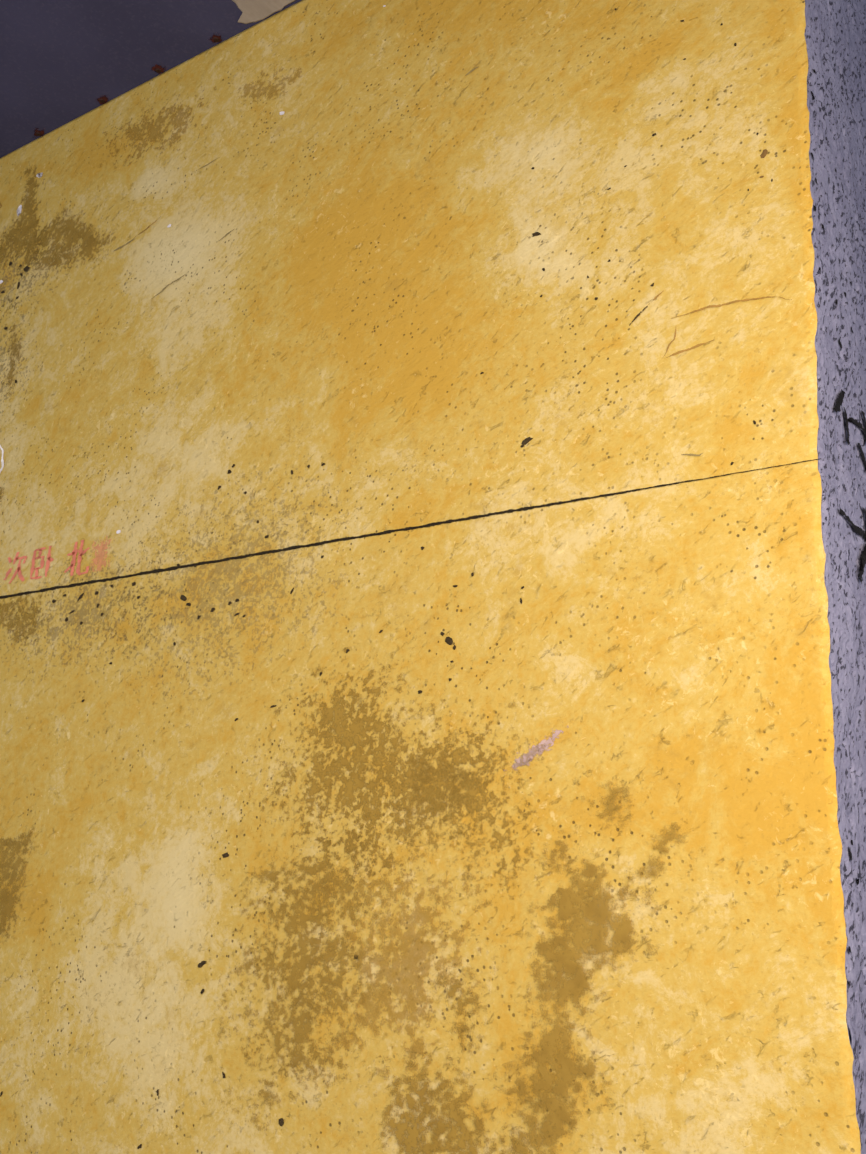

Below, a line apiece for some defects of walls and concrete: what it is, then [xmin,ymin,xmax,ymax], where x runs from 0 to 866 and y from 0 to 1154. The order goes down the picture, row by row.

water stain [0,168,110,270]
water stain [4,326,21,385]
water stain [0,595,41,642]
water stain [0,831,32,936]
water stain [237,651,682,1154]